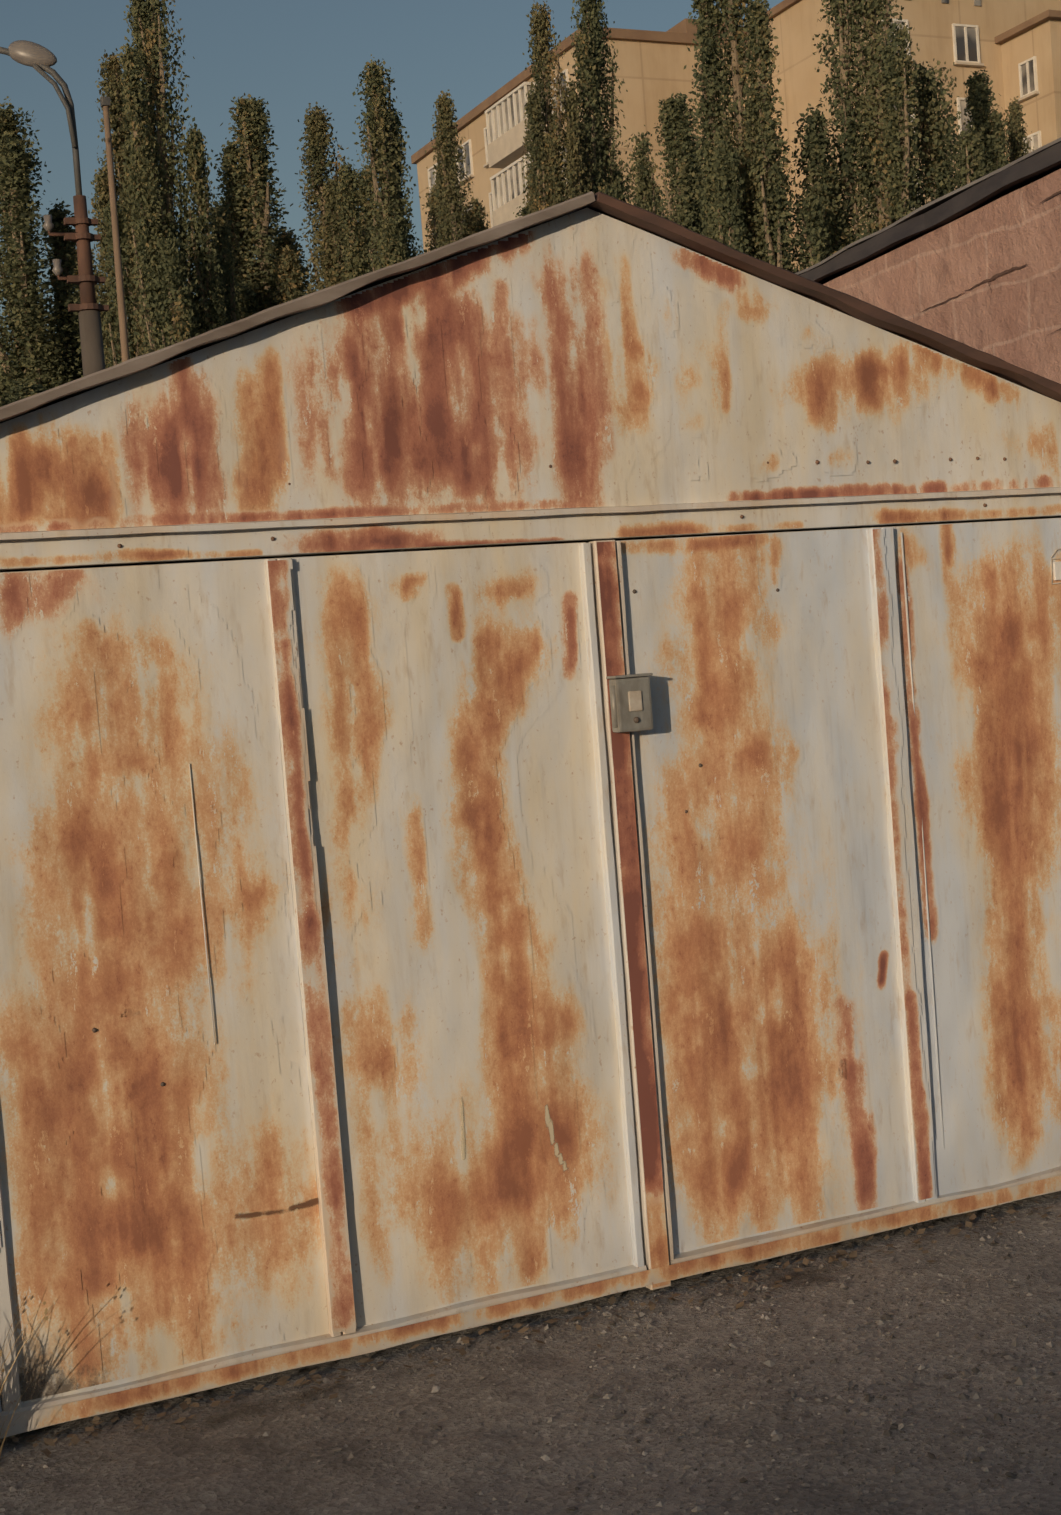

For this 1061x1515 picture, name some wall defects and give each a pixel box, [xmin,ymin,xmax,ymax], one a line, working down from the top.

rust [0,210,1061,533]
rust [0,499,1061,1430]